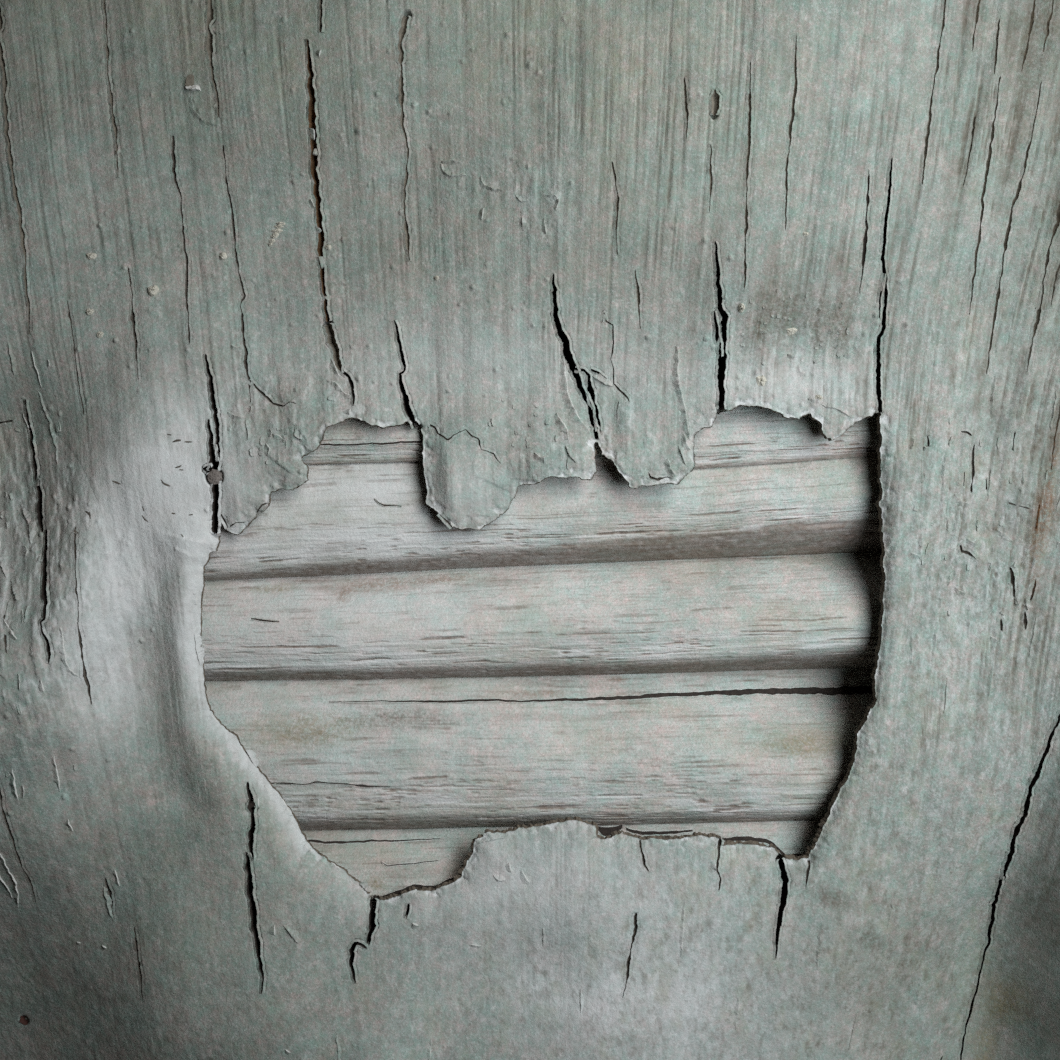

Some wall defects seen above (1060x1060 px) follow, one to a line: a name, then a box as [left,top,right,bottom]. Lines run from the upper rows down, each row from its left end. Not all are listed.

crack [161,135,268,537]
crack [220,145,298,409]
crack [304,0,358,406]
crack [549,161,644,440]
crack [681,61,754,410]
crack [782,35,800,230]
crack [0,399,95,706]
spalling [192,345,886,900]
crack [243,780,391,994]
crack [307,837,472,984]
crack [598,825,813,959]
crack [938,710,1060,1060]